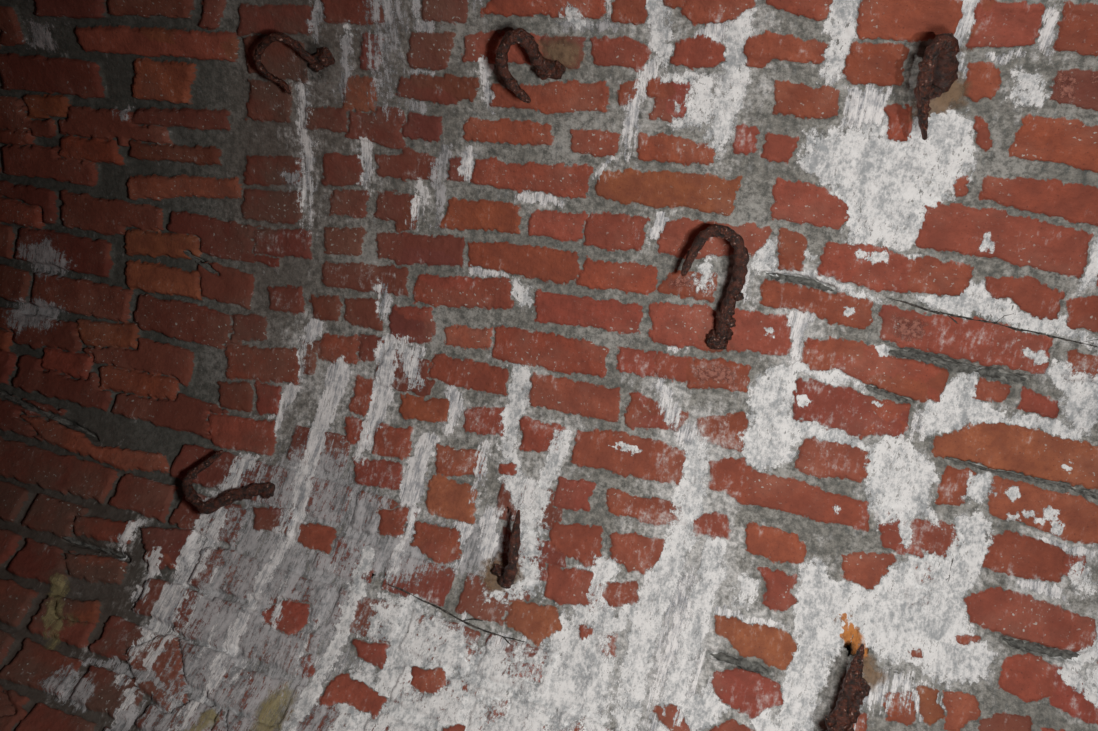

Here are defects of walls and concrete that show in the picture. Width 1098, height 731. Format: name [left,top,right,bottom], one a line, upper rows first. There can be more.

leakage [333,0,435,120]
leakage [280,0,326,237]
leakage [796,0,980,265]
rust [913,79,968,117]
leakage [405,141,476,233]
leakage [514,190,564,209]
leakage [467,265,534,312]
leakage [689,254,717,295]
crack [886,297,1098,348]
leakage [1077,237,1098,296]
leakage [40,279,1098,731]
rust [839,613,884,688]